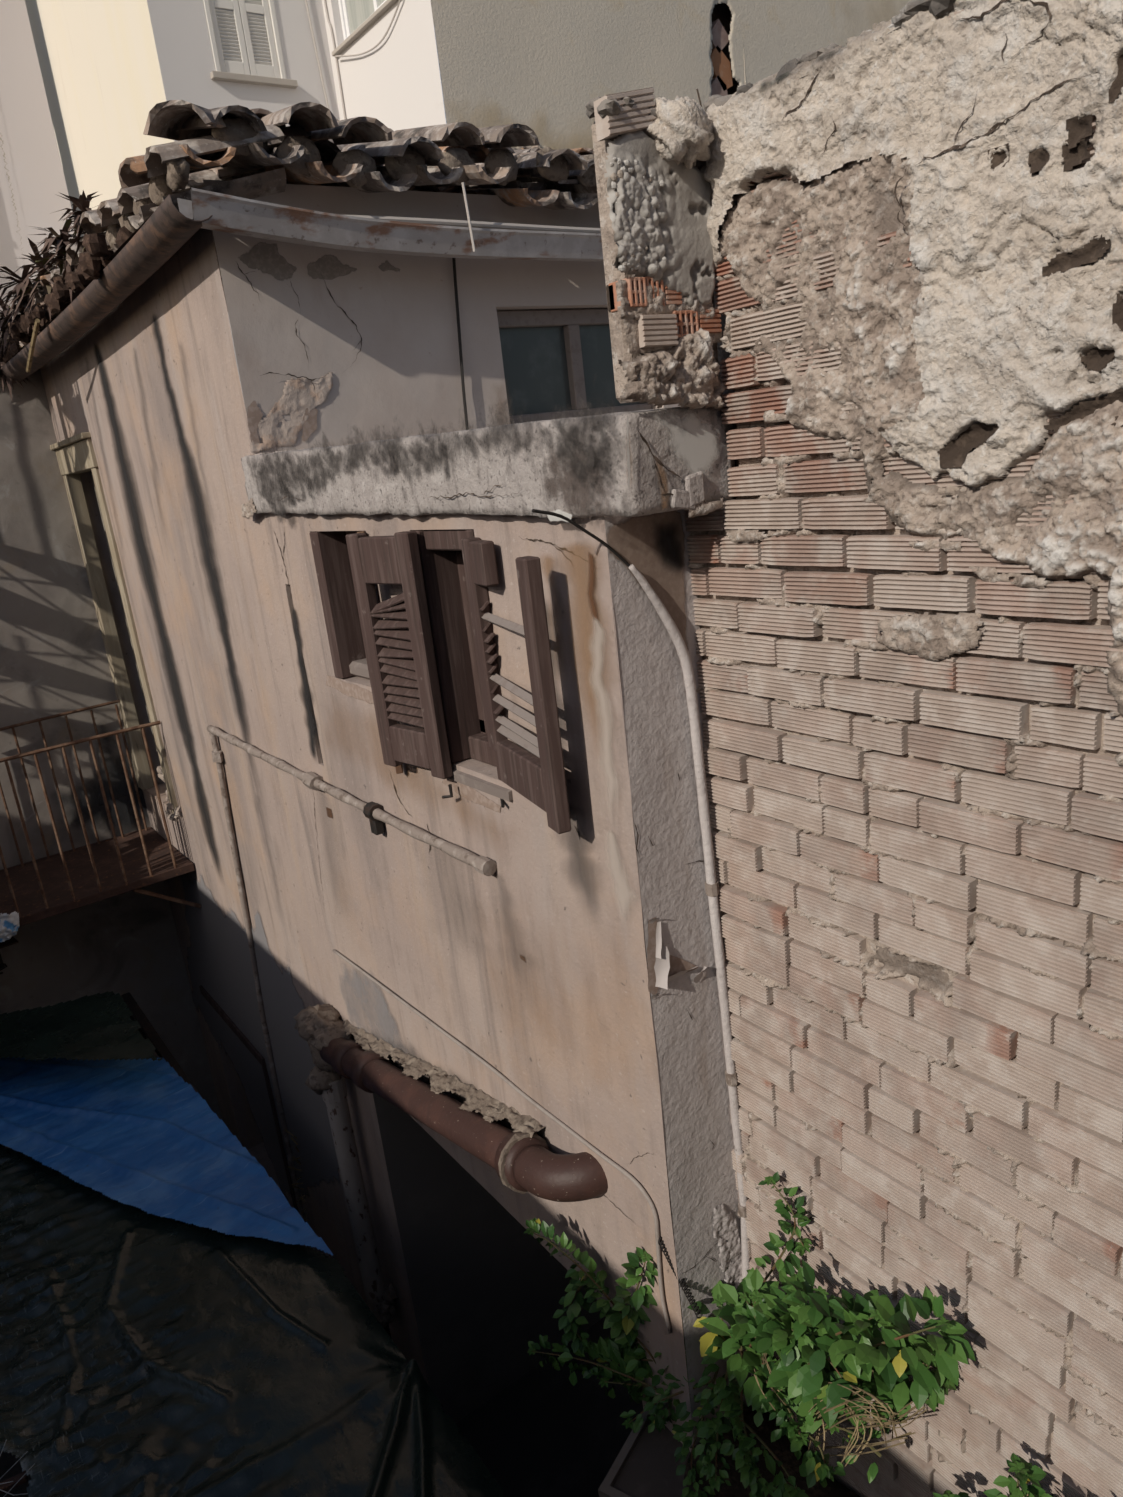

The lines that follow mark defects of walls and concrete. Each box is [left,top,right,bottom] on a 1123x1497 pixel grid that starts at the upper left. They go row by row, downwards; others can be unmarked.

spalling [586,96,658,122]
peeling [240,242,357,280]
crack [236,262,362,390]
spalling [606,285,615,313]
spalling [614,178,666,273]
spalling [247,372,333,453]
leakage [253,402,630,522]
spalling [716,148,1123,717]
leakage [94,345,219,867]
leakage [153,317,247,743]
peeling [607,498,723,650]
peeling [647,917,707,999]